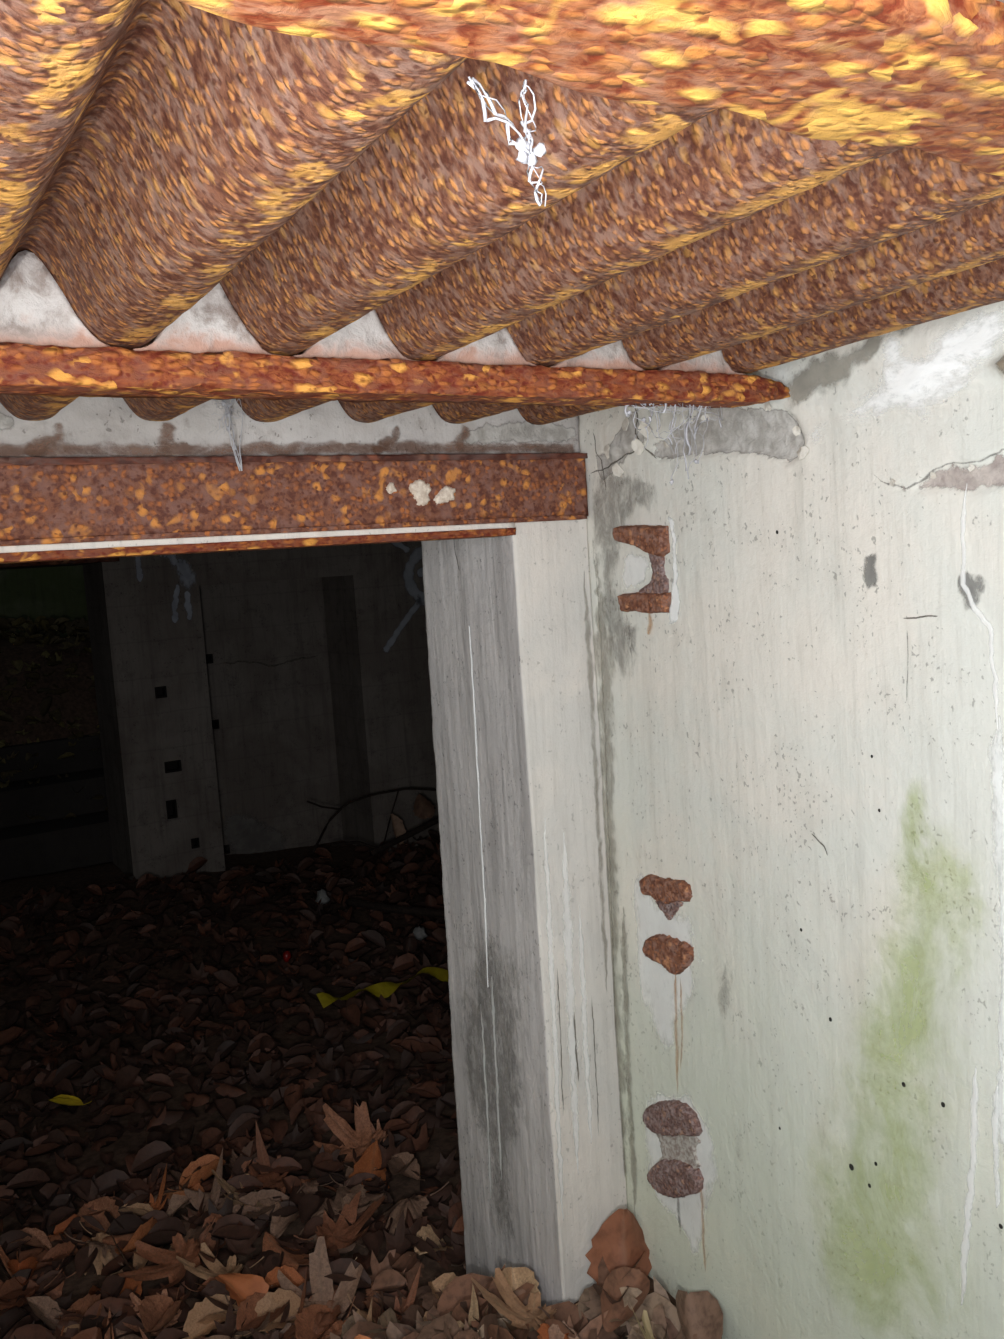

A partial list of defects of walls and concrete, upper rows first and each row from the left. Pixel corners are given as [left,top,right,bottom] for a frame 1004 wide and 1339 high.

spalling [460,421,575,445]
spalling [592,401,809,488]
spalling [888,453,1004,491]
water stain [469,626,502,1207]